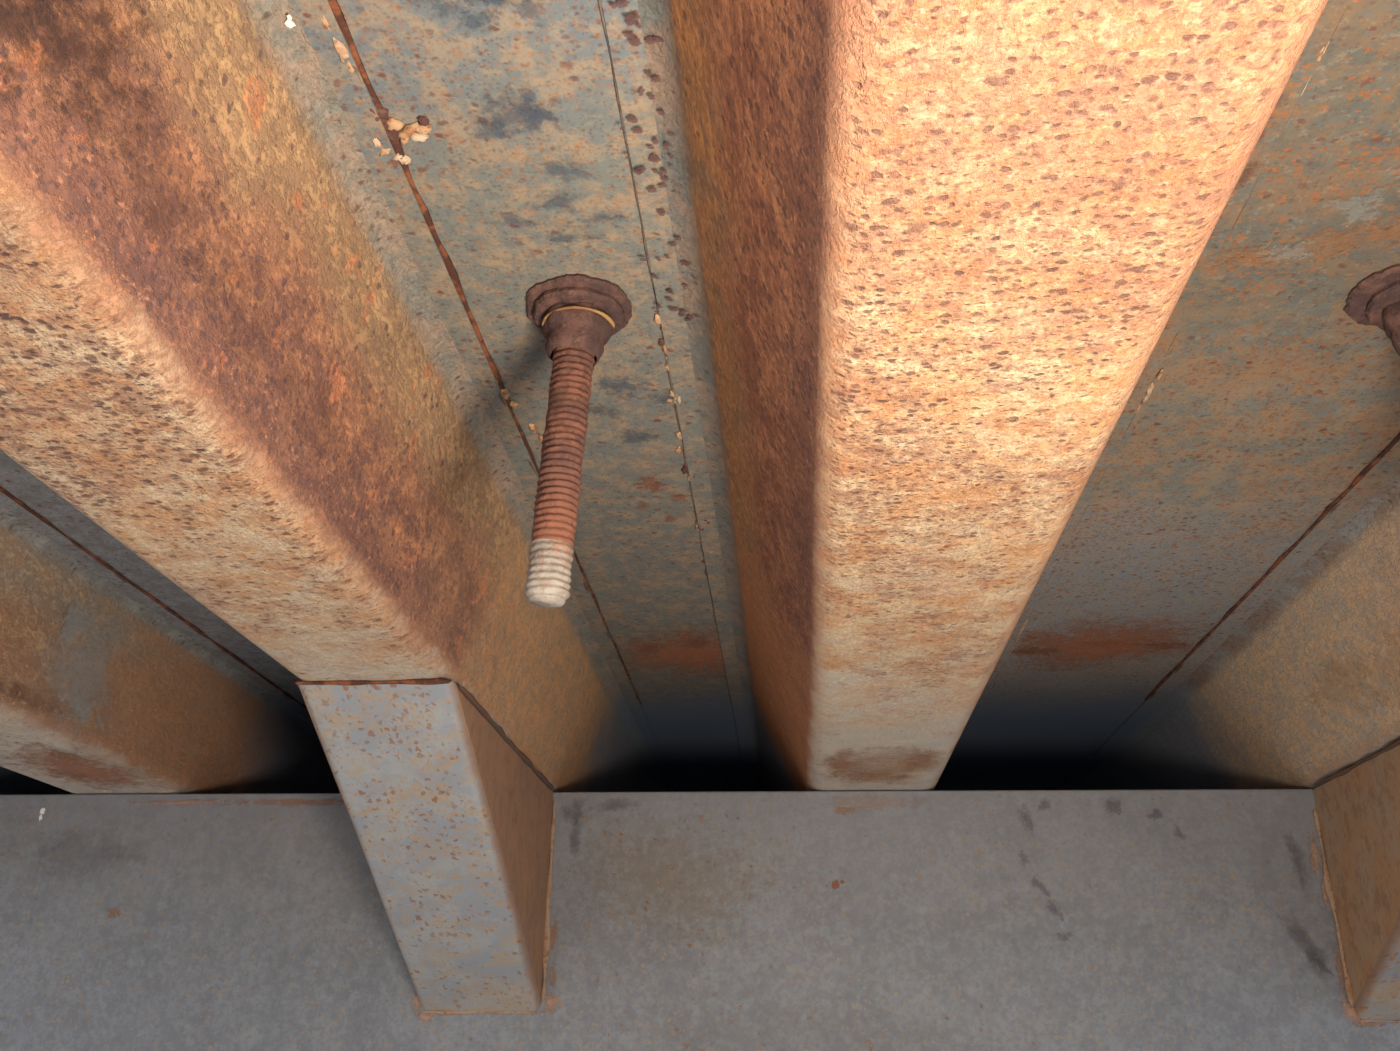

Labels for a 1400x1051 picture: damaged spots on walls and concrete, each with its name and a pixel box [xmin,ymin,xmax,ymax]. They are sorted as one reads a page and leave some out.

rust [609,0,664,46]
rust [0,0,149,126]
rust [639,71,665,115]
rust [619,116,673,193]
rust [640,237,694,321]